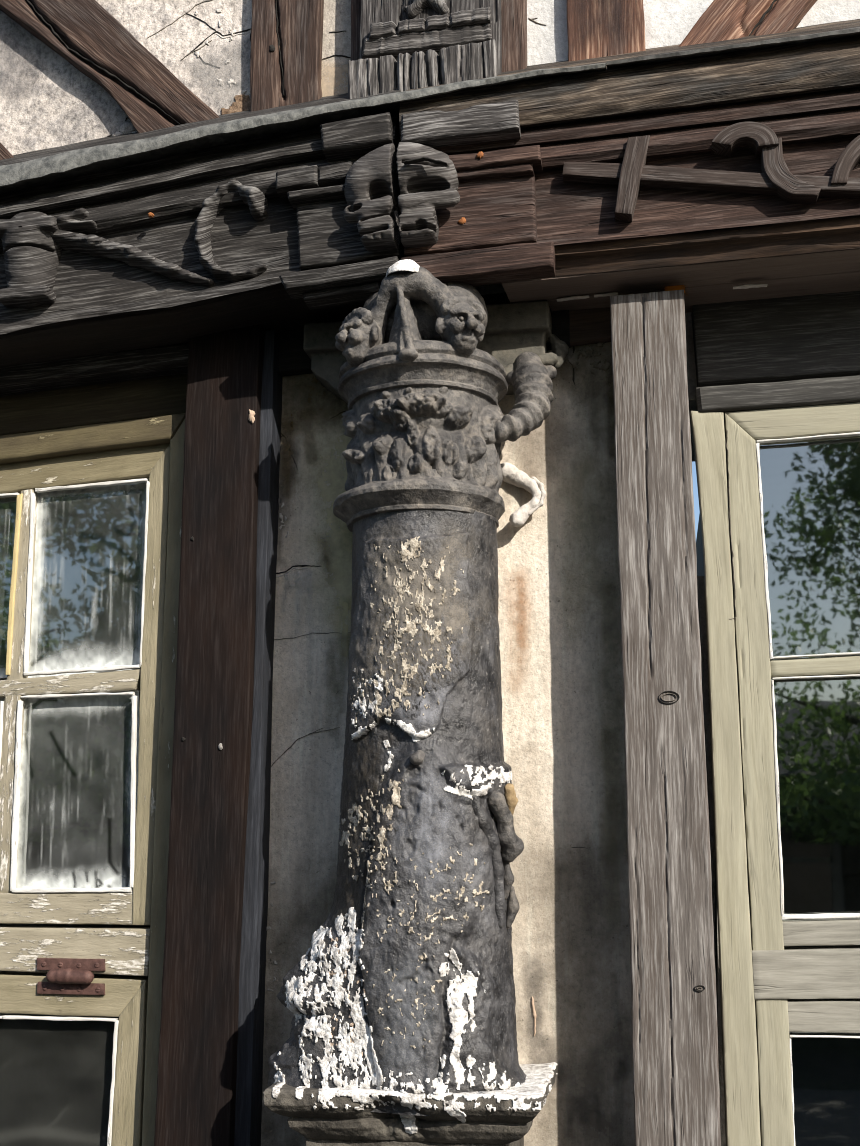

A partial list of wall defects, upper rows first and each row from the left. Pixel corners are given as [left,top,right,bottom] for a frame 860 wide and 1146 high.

crack [27,0,180,138]
crack [147,0,285,96]
crack [276,565,320,577]
peeling [351,536,464,742]
crack [271,727,340,767]
spalling [267,740,558,1134]